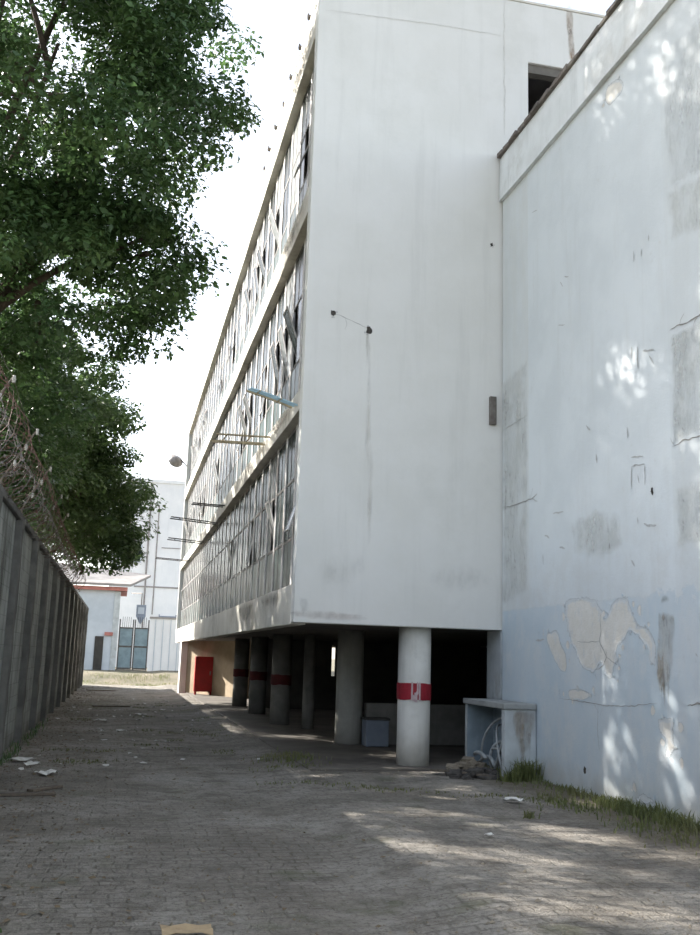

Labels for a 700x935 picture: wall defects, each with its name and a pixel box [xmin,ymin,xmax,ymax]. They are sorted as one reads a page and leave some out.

peeling [543,594,660,682]
peeling [651,705,684,769]